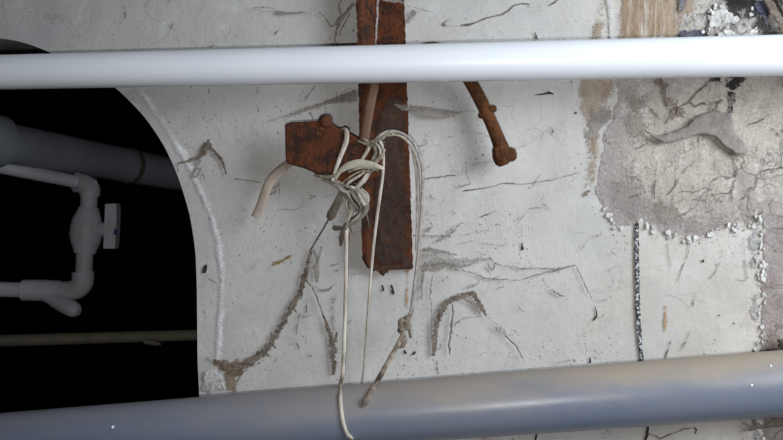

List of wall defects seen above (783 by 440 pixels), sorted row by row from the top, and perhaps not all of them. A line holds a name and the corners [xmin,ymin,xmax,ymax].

crack [443,3,530,26]
damp [589,0,709,39]
flaking render [678,0,783,37]
damp [727,0,783,35]
damp [705,77,747,113]
crack [632,114,783,219]
flaking render [595,76,783,352]
crack [634,223,644,361]
crack [644,426,697,440]
flaking render [752,418,783,440]